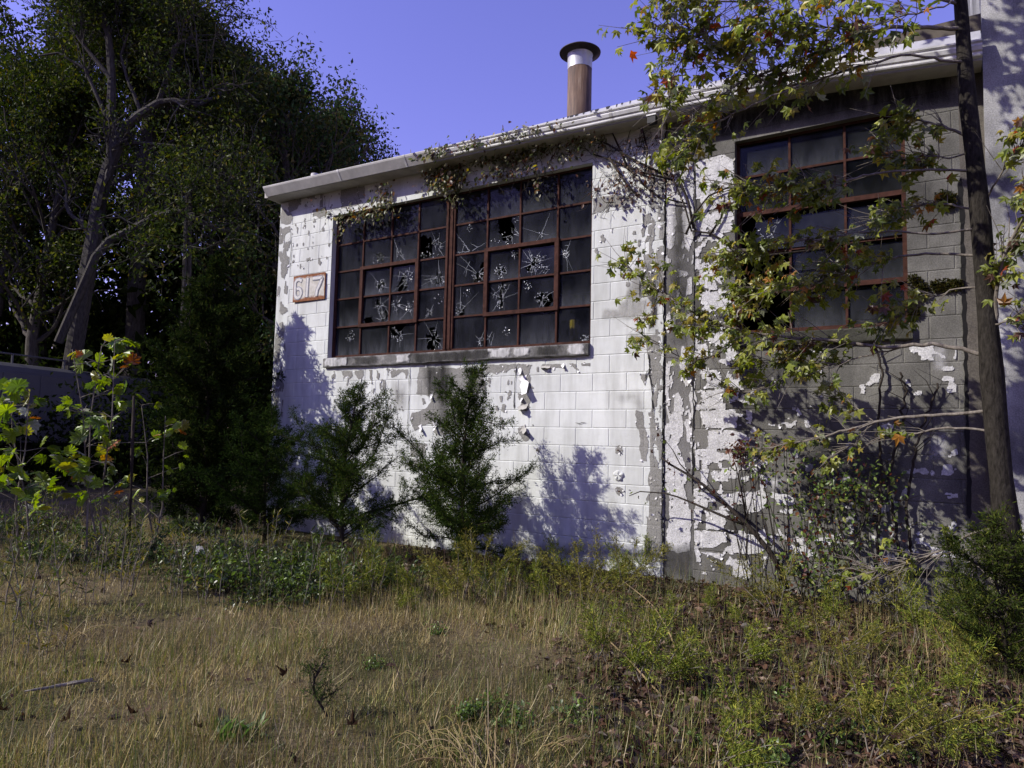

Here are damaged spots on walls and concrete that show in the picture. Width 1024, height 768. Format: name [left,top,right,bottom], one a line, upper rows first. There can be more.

peeling [271,185,384,417]
peeling [325,344,590,484]
peeling [592,155,967,580]